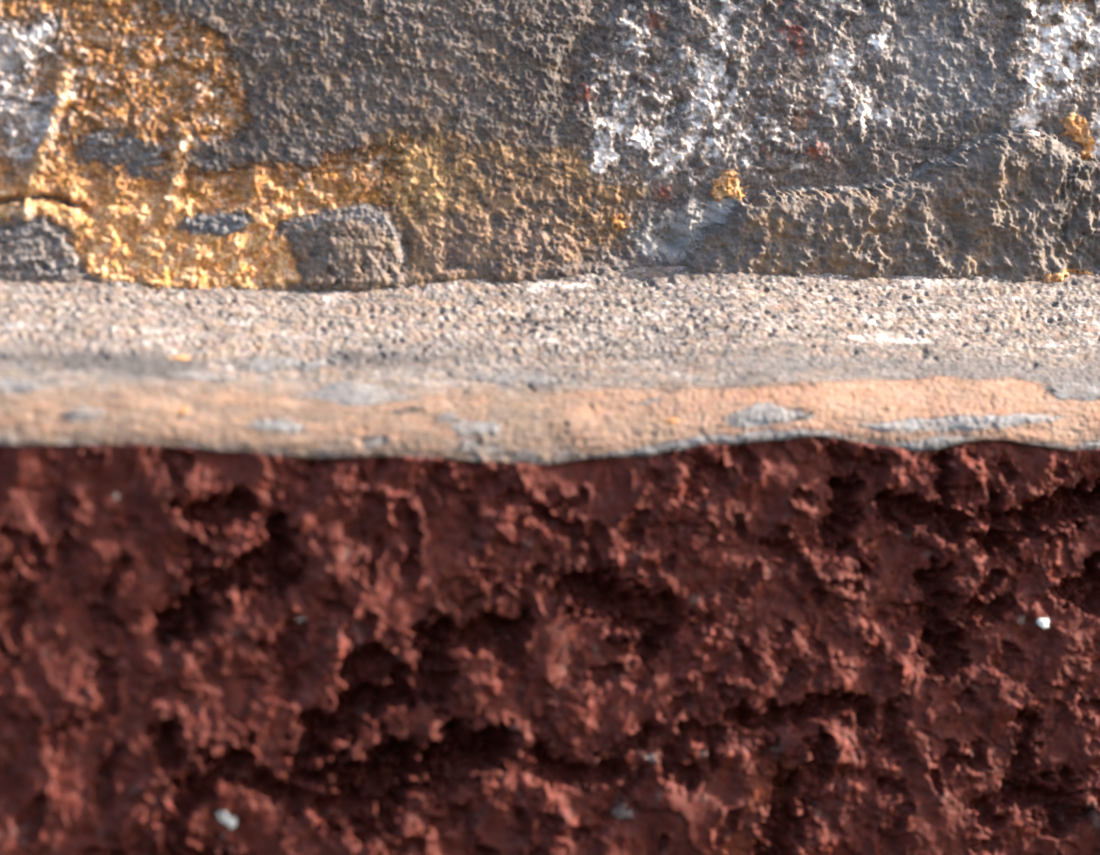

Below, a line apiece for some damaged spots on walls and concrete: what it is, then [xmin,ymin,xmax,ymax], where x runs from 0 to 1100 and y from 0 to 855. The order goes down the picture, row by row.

leakage [0,0,71,165]
leakage [820,0,869,19]
leakage [793,37,905,130]
leakage [866,23,893,56]
leakage [1009,0,1100,136]
peeling [0,0,420,292]
leakage [388,0,819,283]
leakage [1088,106,1100,156]
peeling [611,209,628,231]